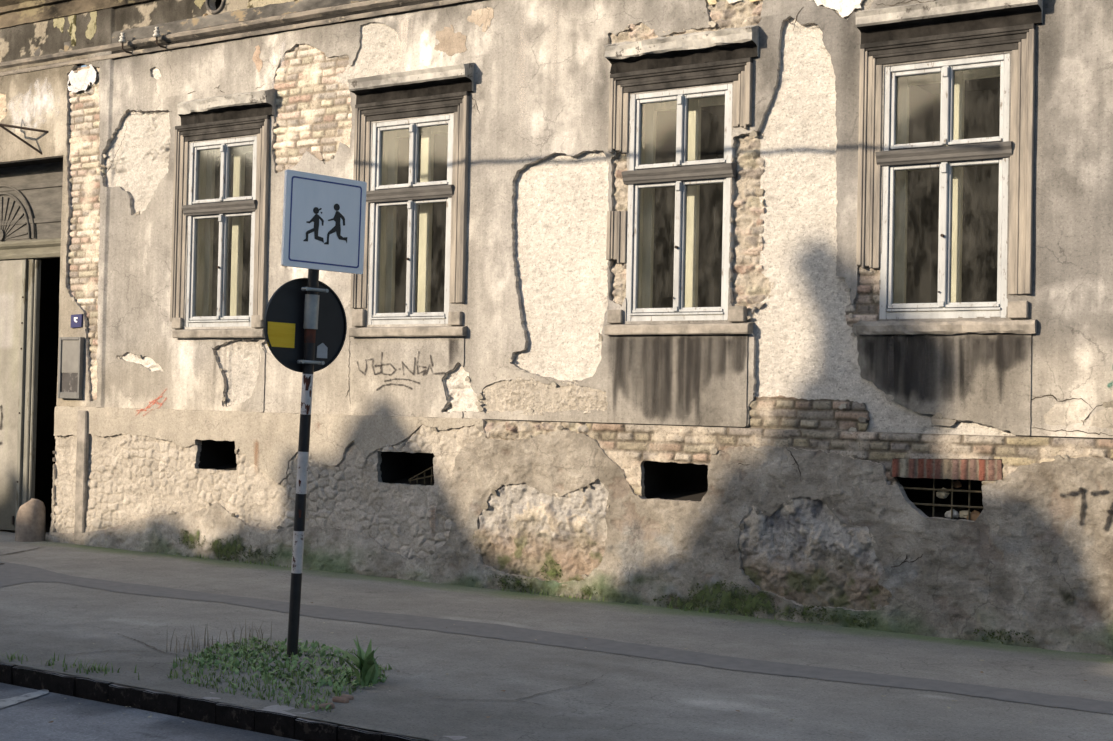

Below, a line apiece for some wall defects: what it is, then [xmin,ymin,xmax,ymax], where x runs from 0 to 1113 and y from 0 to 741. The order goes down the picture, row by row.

peeling [53,11,97,46]
peeling [247,0,298,9]
flaking render [610,0,764,44]
flaking render [812,0,873,20]
flaking render [53,18,1113,559]
damp [614,335,625,398]
damp [644,335,700,416]
damp [719,334,746,372]
damp [869,334,963,400]
damp [986,333,1021,386]
crack [1031,394,1112,436]
flaking render [473,479,610,586]